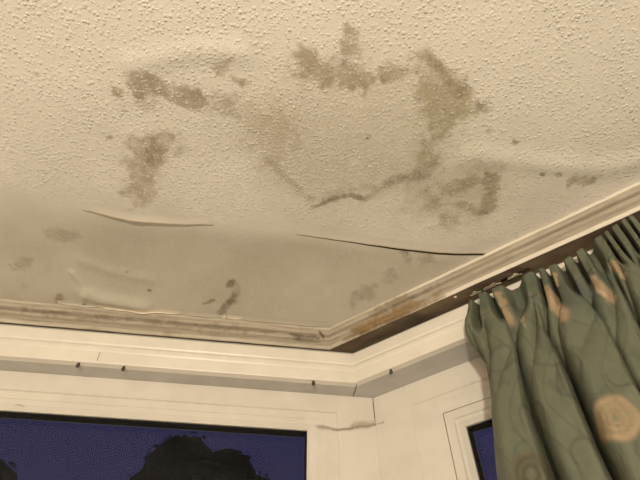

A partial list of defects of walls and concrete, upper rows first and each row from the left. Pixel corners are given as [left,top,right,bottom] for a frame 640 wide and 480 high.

crack [318,398,375,431]